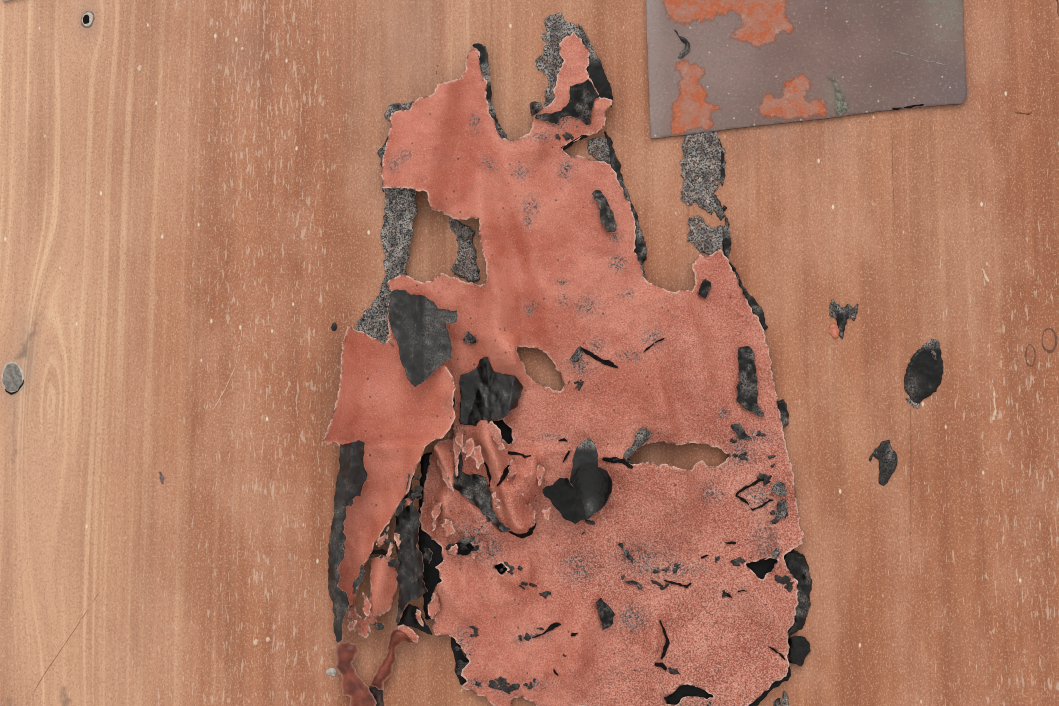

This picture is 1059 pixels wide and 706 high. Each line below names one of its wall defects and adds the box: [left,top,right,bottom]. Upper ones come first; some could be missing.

peeling [323,12,812,706]
peeling [829,324,840,338]